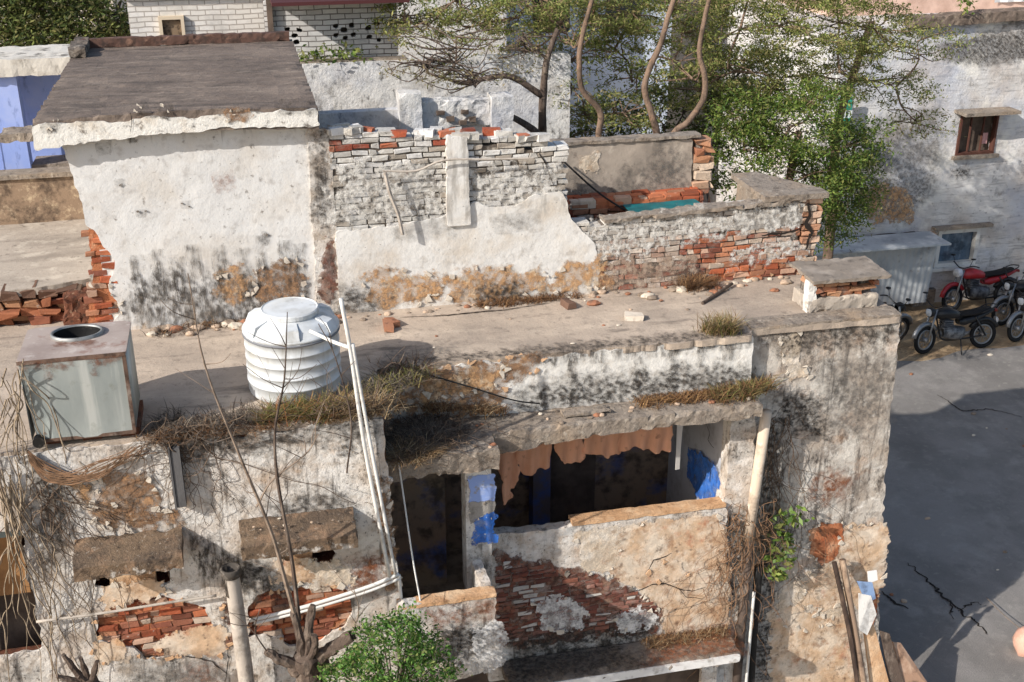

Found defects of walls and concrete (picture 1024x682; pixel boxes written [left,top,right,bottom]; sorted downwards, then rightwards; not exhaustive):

peeling [469,159,561,207]
damp [124,243,308,326]
peeling [213,154,445,305]
peeling [362,201,810,309]
damp [391,329,750,412]
peeling [71,470,185,532]
spalling [89,578,233,666]
peeling [247,557,357,641]
spalling [467,474,733,650]
spalling [765,521,891,682]